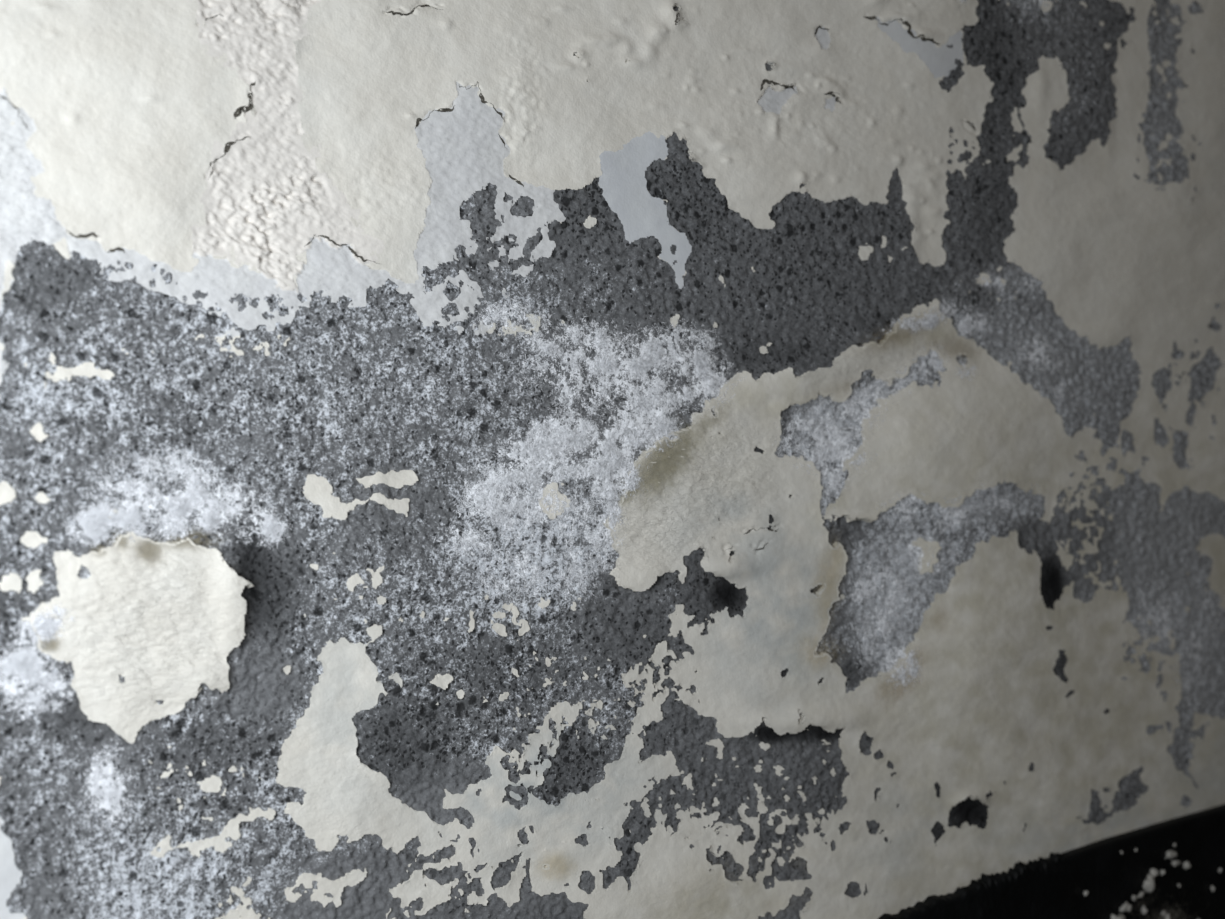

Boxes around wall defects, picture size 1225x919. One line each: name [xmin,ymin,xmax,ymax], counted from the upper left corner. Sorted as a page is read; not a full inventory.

crack [208,81,256,179]
crack [305,235,379,264]
crack [387,4,442,16]
crack [415,83,524,187]
peeling [65,0,1142,457]
crack [864,16,941,45]
peeling [1133,0,1204,201]
peeling [0,88,749,919]
peeling [774,350,1045,693]
peeling [1050,450,1225,788]
peeling [599,677,849,890]
peeling [931,781,1005,846]